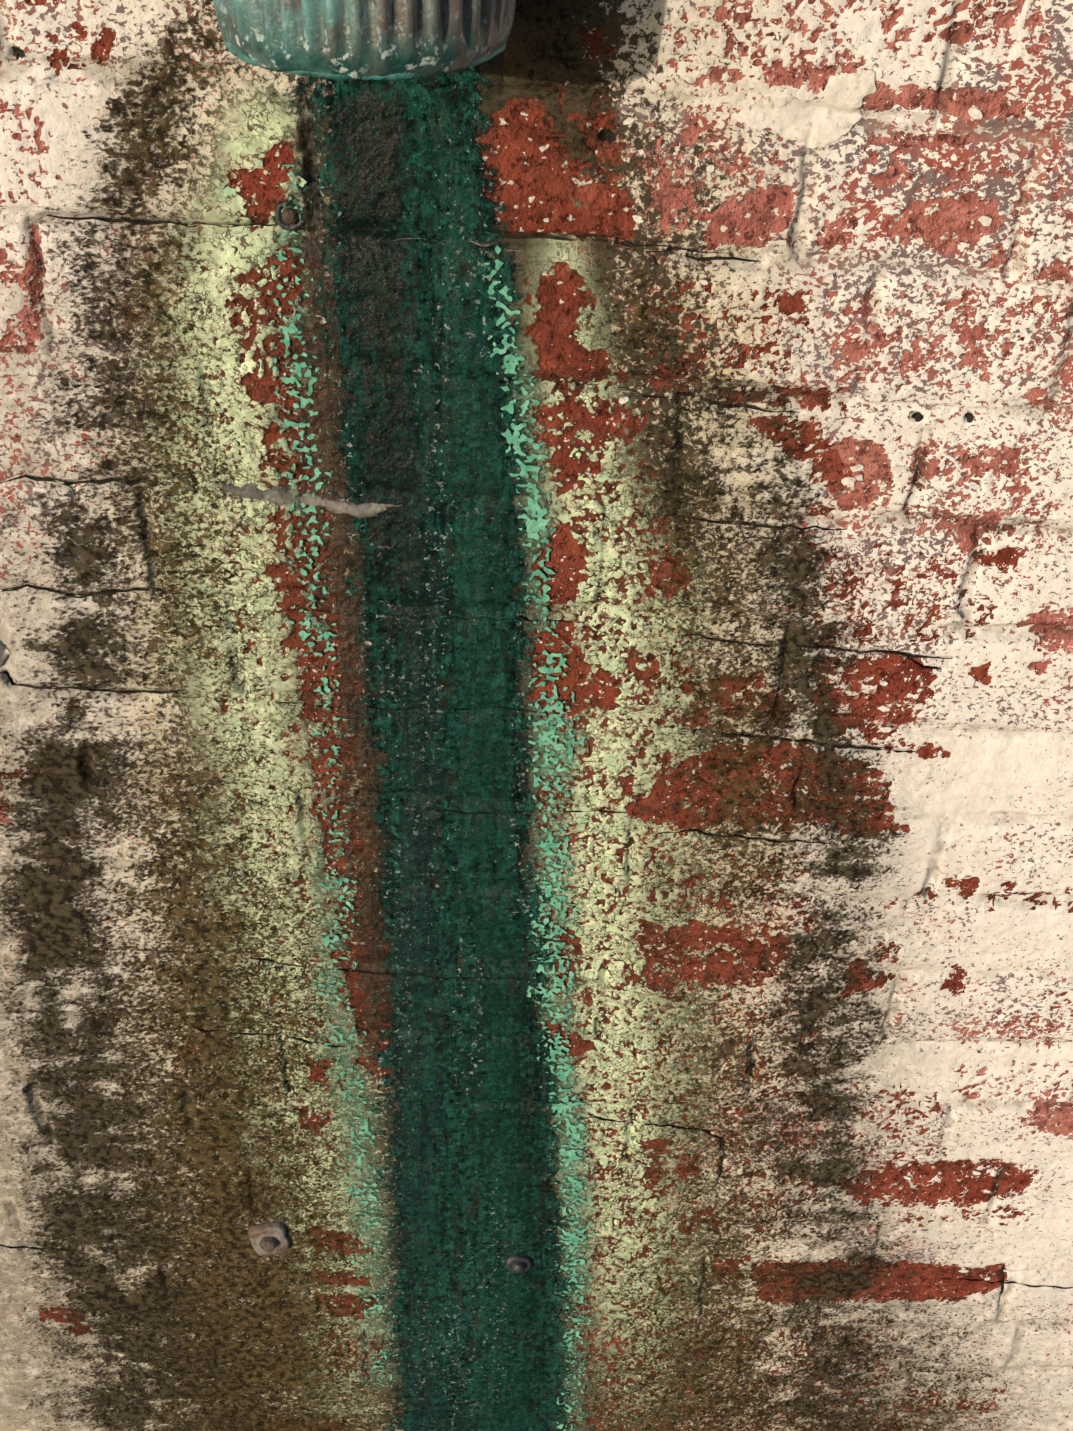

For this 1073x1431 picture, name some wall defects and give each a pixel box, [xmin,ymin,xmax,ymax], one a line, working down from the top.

peeling [0,21,116,360]
crack [1,584,183,598]
crack [0,642,183,694]
crack [687,634,951,669]
damp [308,718,331,752]
peeling [474,0,1073,1431]
crack [663,726,916,753]
peeling [183,134,405,1401]
peeling [0,767,48,825]
peeling [23,1304,96,1336]